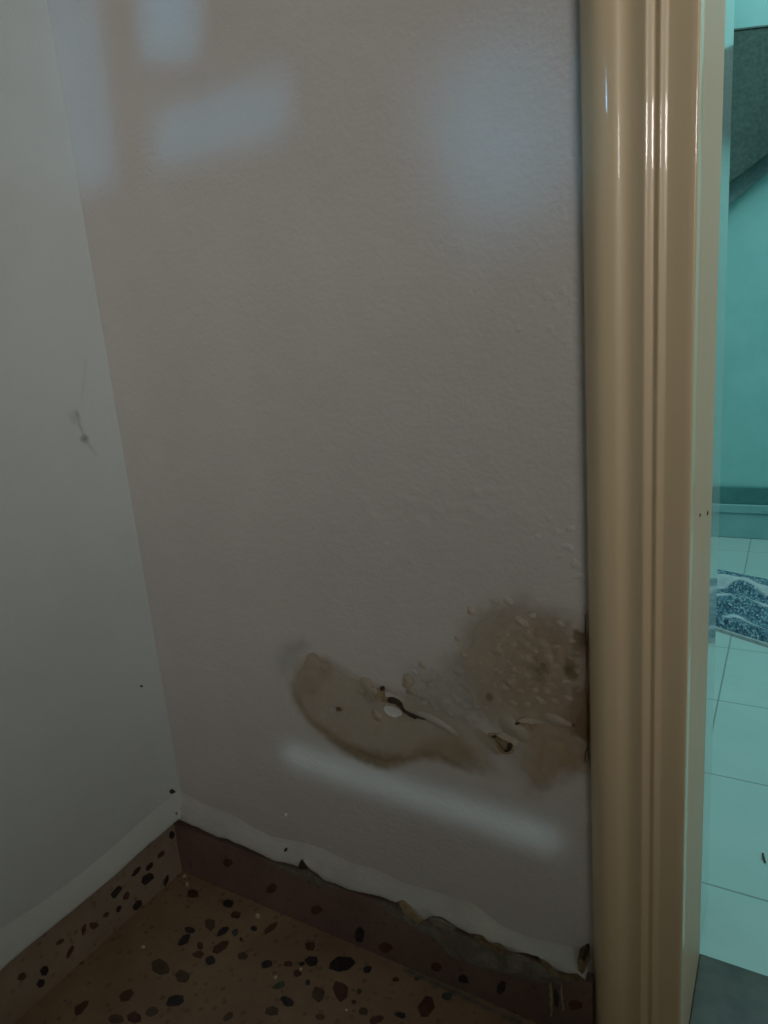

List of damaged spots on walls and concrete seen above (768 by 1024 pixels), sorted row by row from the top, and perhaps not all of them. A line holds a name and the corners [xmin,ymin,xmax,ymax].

peeling [365,686,405,718]
leakage [295,664,485,766]
spalling [476,716,543,755]
leakage [463,615,575,779]
spalling [382,900,590,984]